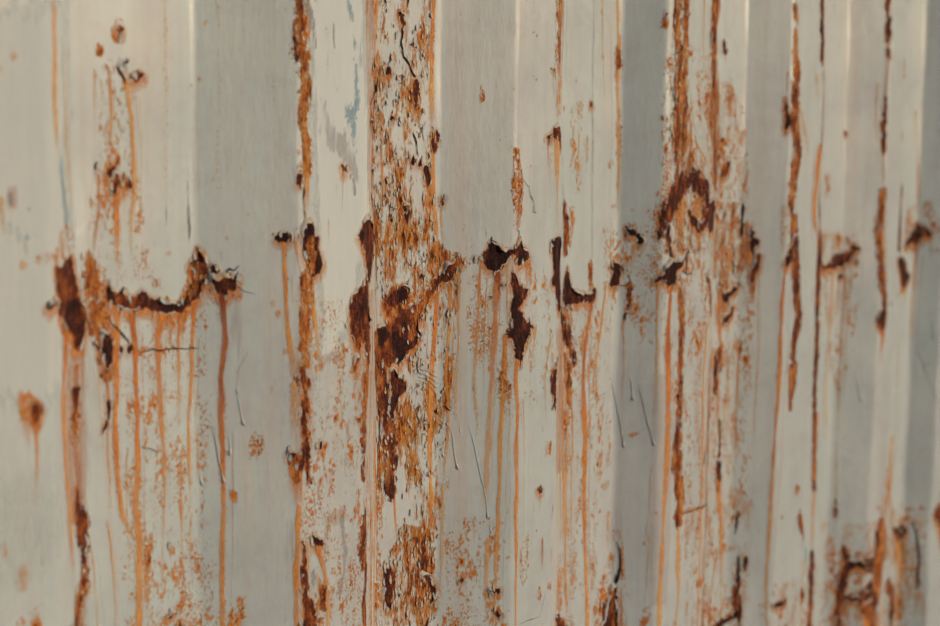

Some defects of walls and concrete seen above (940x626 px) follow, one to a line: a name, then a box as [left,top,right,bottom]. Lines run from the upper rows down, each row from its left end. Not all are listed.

rust [18,224,96,626]
rust [98,111,144,233]
rust [103,246,254,626]
rust [249,435,264,456]
peeling [370,0,462,626]
rust [759,0,940,626]